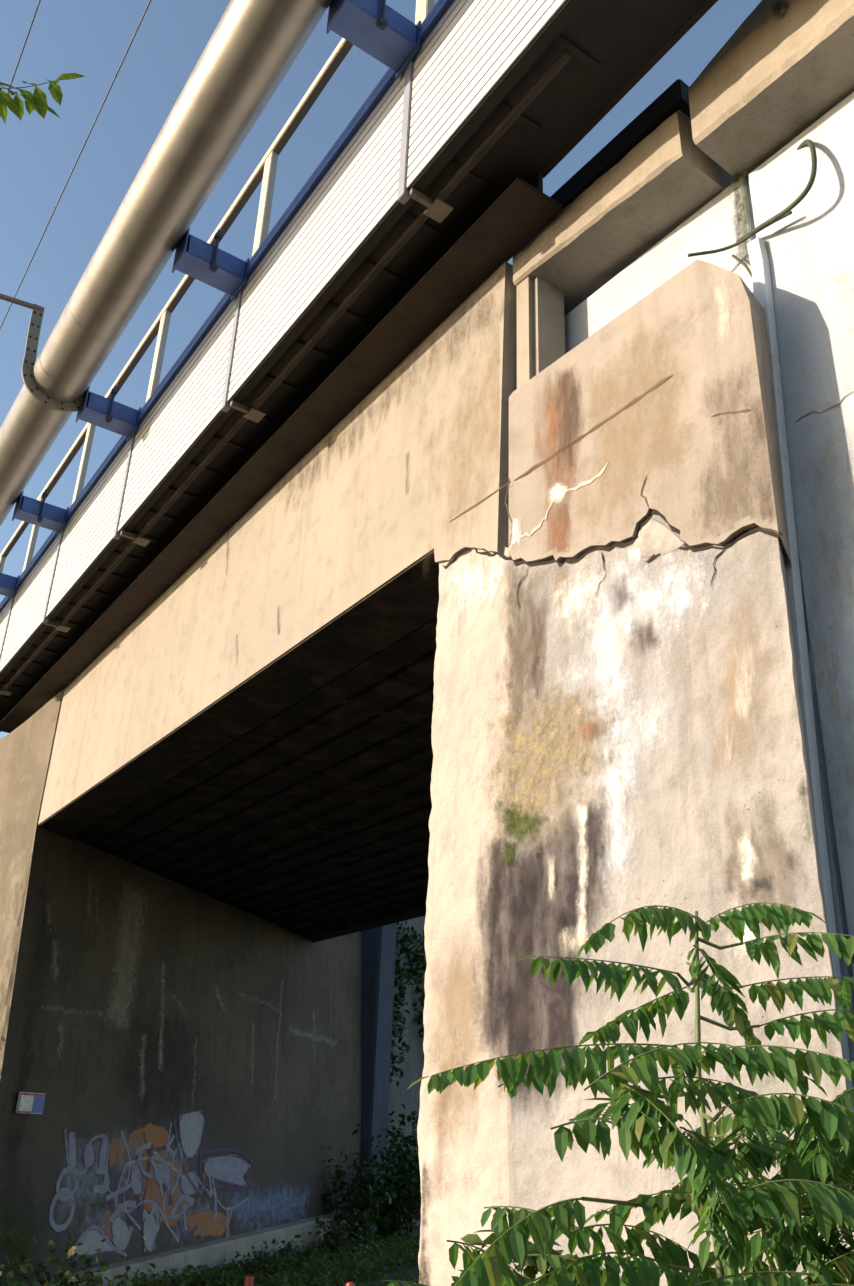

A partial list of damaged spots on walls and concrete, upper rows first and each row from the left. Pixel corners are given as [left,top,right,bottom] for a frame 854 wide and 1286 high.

rust [540,374,578,489]
crack [794,391,854,423]
crack [442,475,783,622]
leakage [480,810,602,1101]